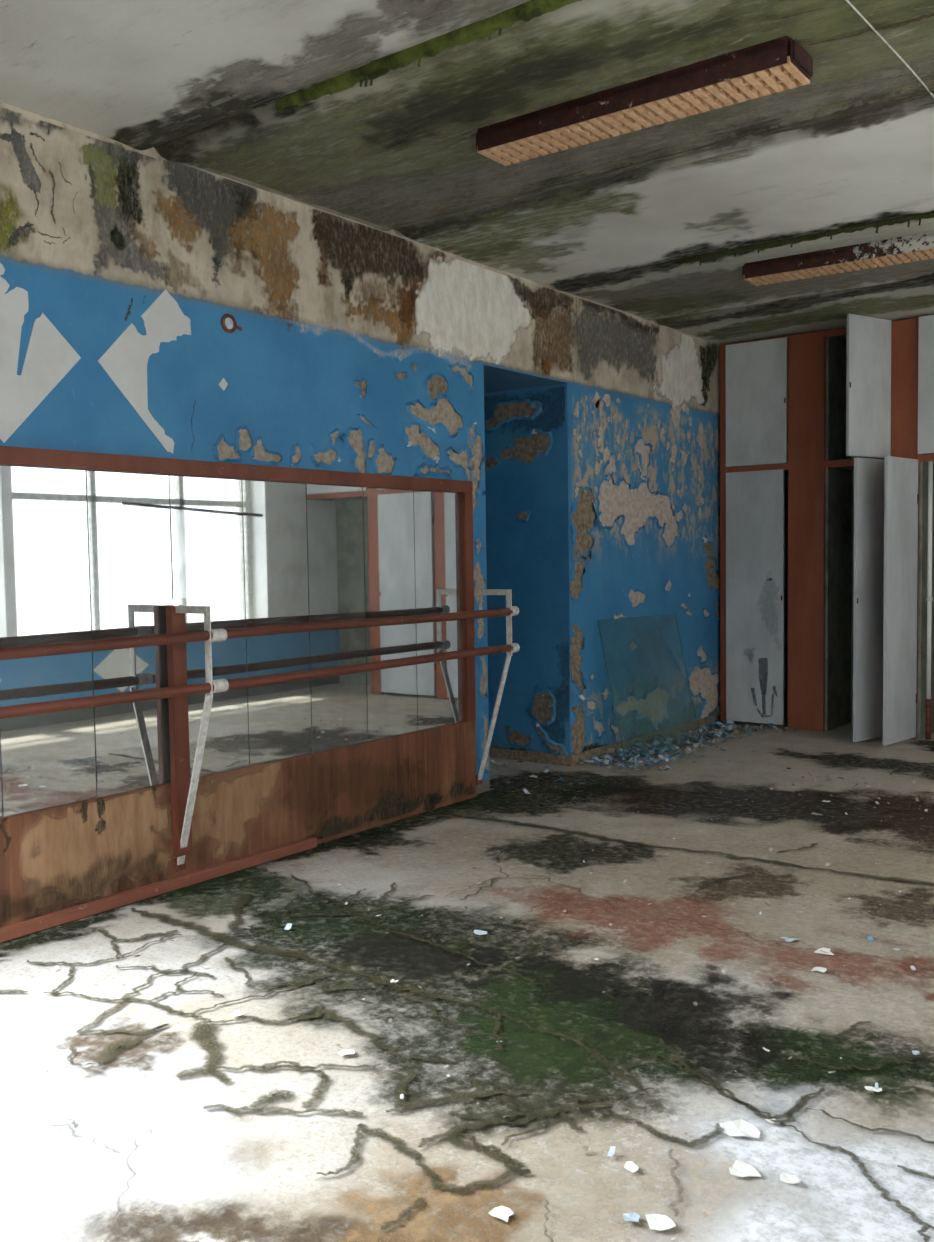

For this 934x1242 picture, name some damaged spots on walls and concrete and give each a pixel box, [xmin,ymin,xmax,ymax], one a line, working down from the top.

flaking render [0,127,41,193]
leakage [0,108,63,135]
leakage [82,0,934,411]
peeling [213,414,397,475]
peeling [393,362,553,515]
peeling [569,392,704,605]
peeling [474,535,490,774]
peeling [504,621,673,756]
leakage [575,781,934,853]
crack [0,815,934,1242]
leakage [524,956,793,1073]
leakage [108,1085,934,1242]